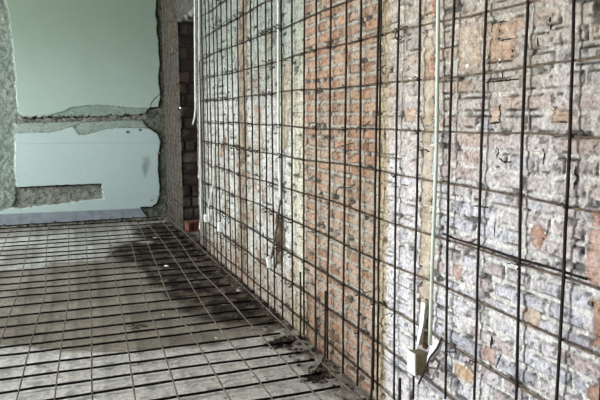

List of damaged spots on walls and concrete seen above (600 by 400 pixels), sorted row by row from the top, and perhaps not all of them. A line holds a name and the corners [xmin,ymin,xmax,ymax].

spalling [0,0,436,400]
spalling [420,0,600,400]